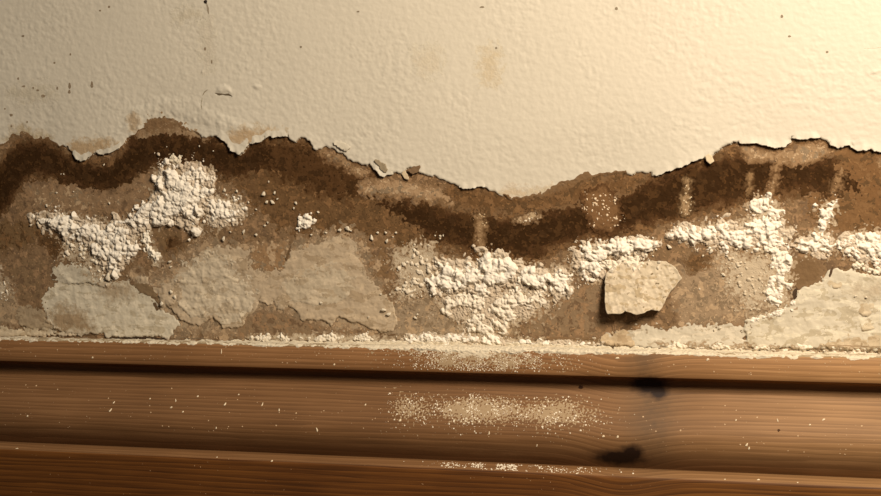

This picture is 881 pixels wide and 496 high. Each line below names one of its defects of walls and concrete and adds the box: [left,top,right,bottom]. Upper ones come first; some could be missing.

leakage [0,108,881,365]
peeling [0,128,881,350]